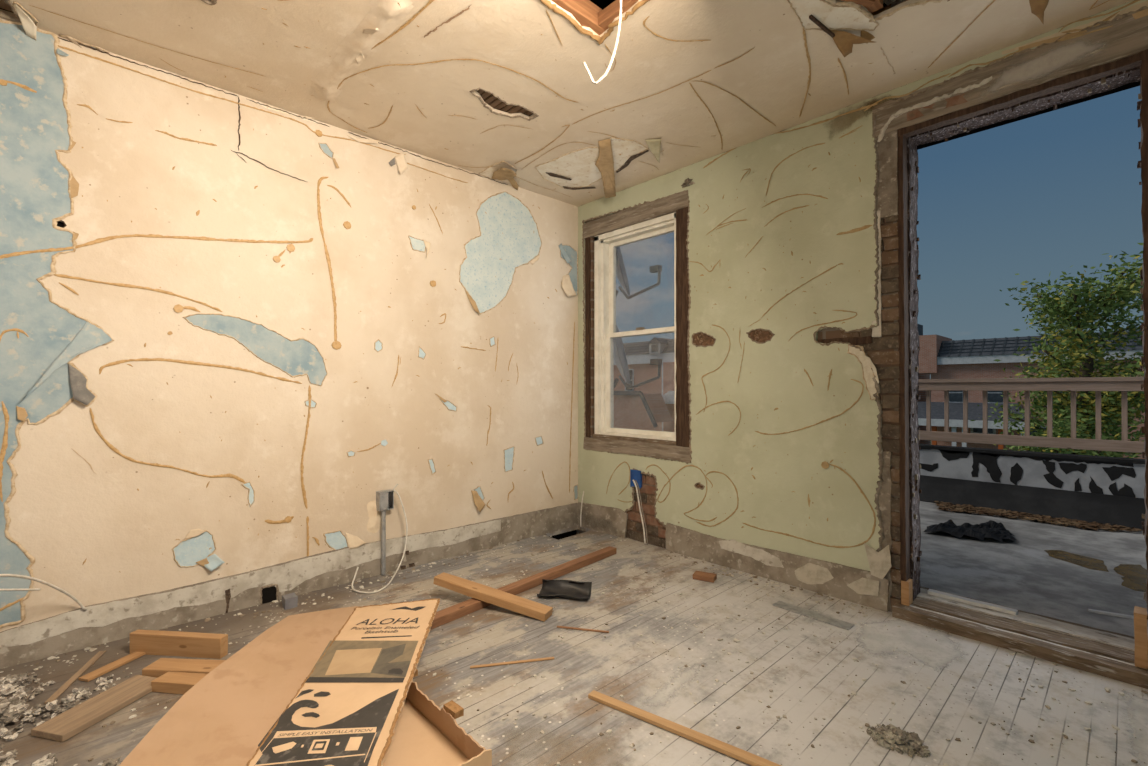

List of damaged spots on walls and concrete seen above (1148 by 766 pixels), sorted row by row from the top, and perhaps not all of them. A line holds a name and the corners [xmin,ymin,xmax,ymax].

crack [58,37,508,185]
spalling [470,88,539,121]
peeling [787,0,879,58]
peeling [896,0,1148,102]
peeling [459,161,542,315]
peeling [0,0,501,648]
peeling [535,137,716,528]
spalling [746,328,775,344]
spalling [813,114,892,596]
peeling [719,539,833,584]